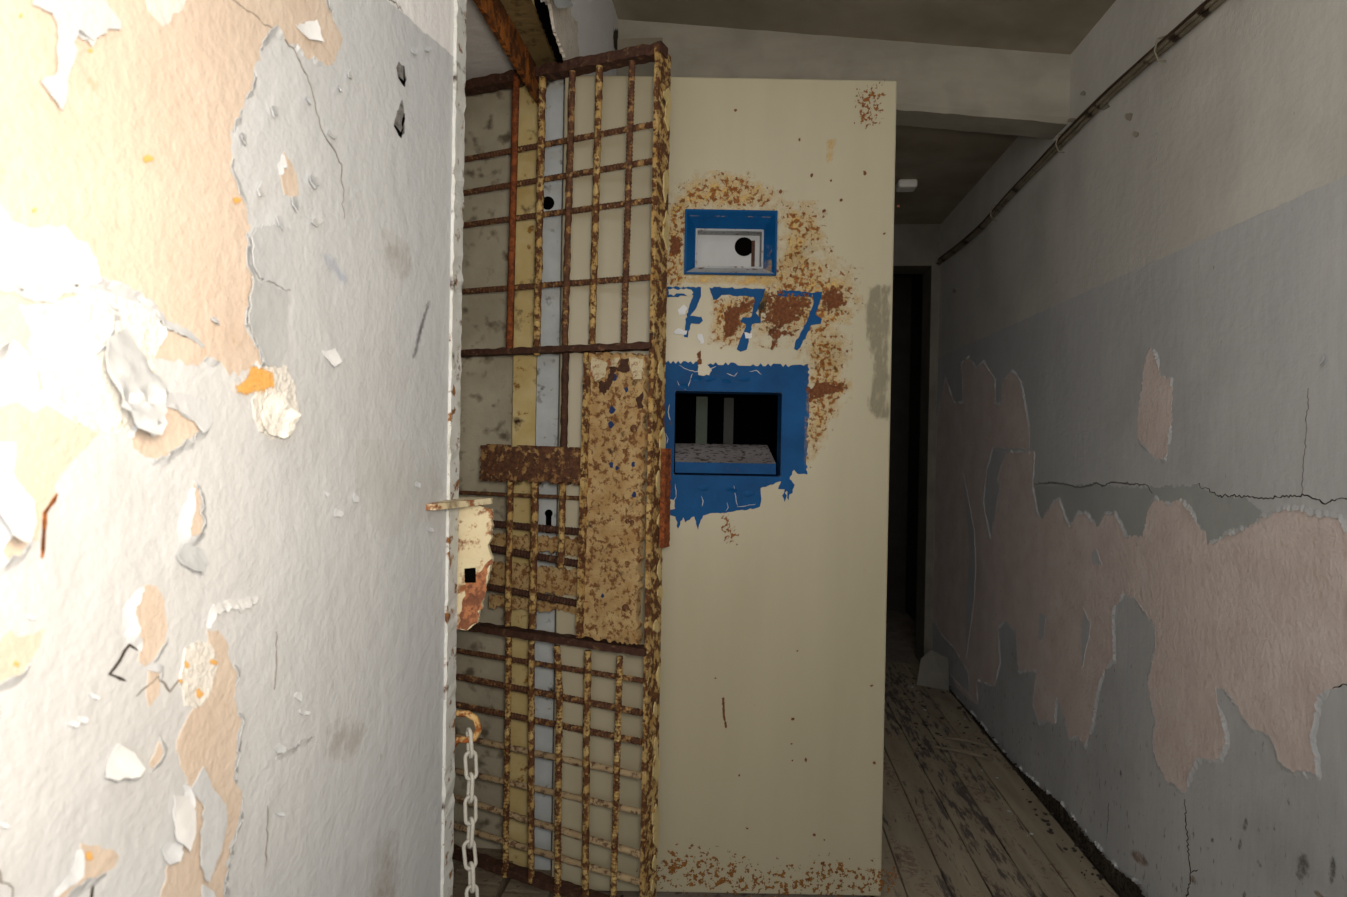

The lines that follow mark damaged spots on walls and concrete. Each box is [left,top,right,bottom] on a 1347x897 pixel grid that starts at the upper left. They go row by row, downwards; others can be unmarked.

crack [234,0,345,219]
peeling [0,0,343,574]
rust [667,170,863,468]
crack [1034,481,1152,493]
crack [1198,388,1347,505]
peeling [0,615,45,692]
rust [458,559,493,631]
peeling [932,347,1347,897]
peeling [123,585,259,897]
crack [0,871,14,897]
peeling [53,843,119,897]
rust [657,833,897,897]